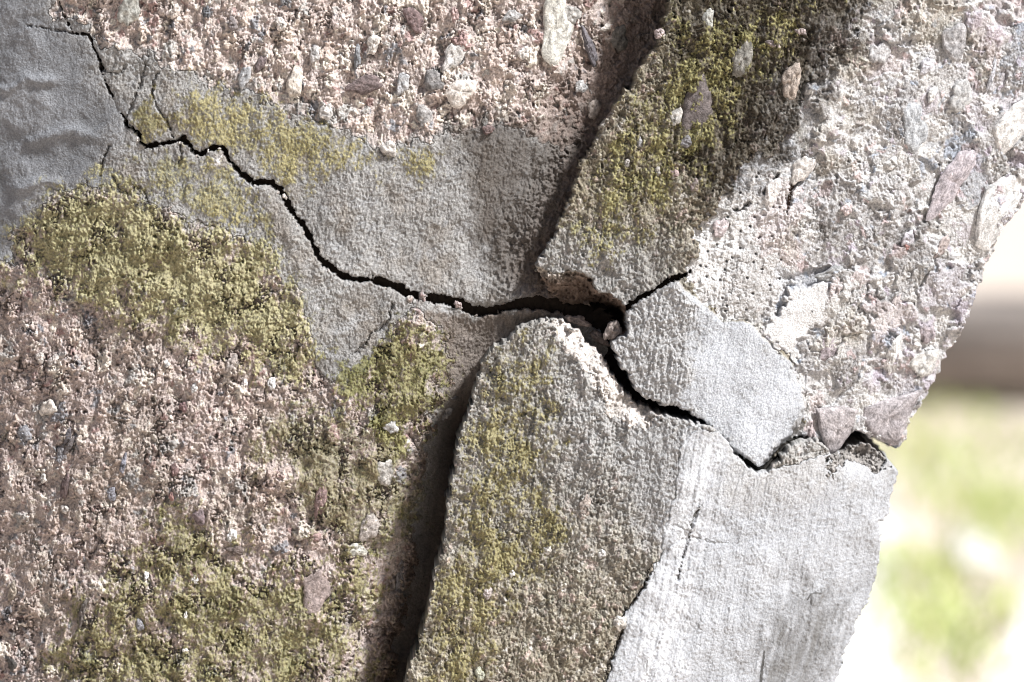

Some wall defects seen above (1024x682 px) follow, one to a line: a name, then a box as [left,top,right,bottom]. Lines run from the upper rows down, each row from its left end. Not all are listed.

crack [29,1,702,420]
crack [776,174,795,212]
spalling [606,0,1024,682]
crack [603,451,731,682]
crack [758,650,766,682]
crack [733,437,834,479]